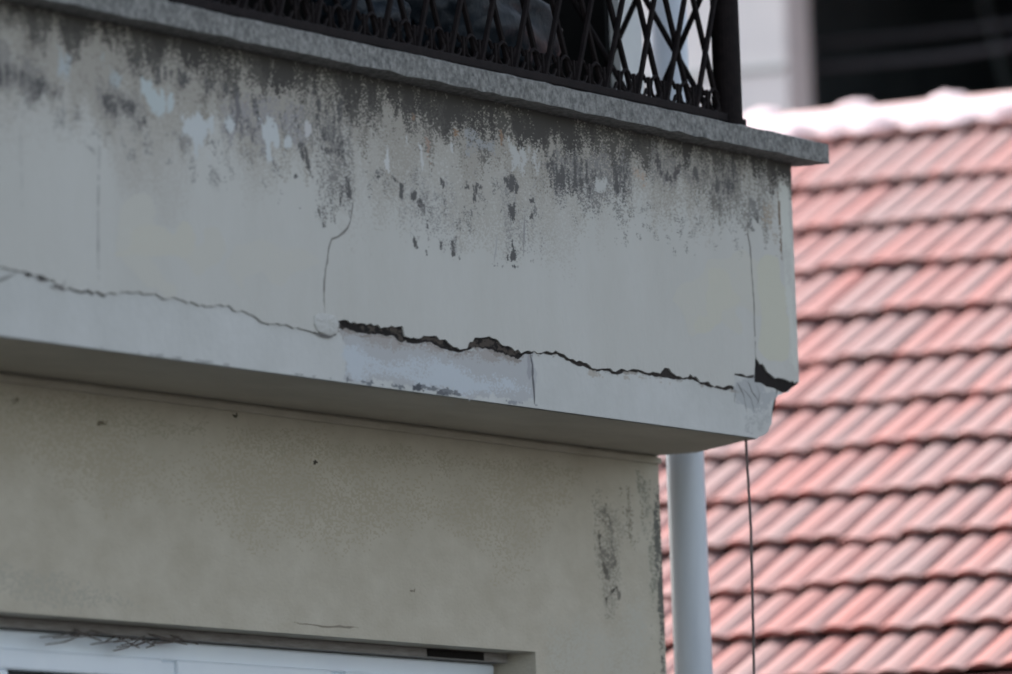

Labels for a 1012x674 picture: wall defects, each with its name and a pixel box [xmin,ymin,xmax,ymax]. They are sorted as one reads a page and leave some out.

leakage [0,383,583,586]
crack [0,138,798,410]
spalling [337,323,539,405]
leakage [592,470,665,674]
spalling [731,377,777,434]